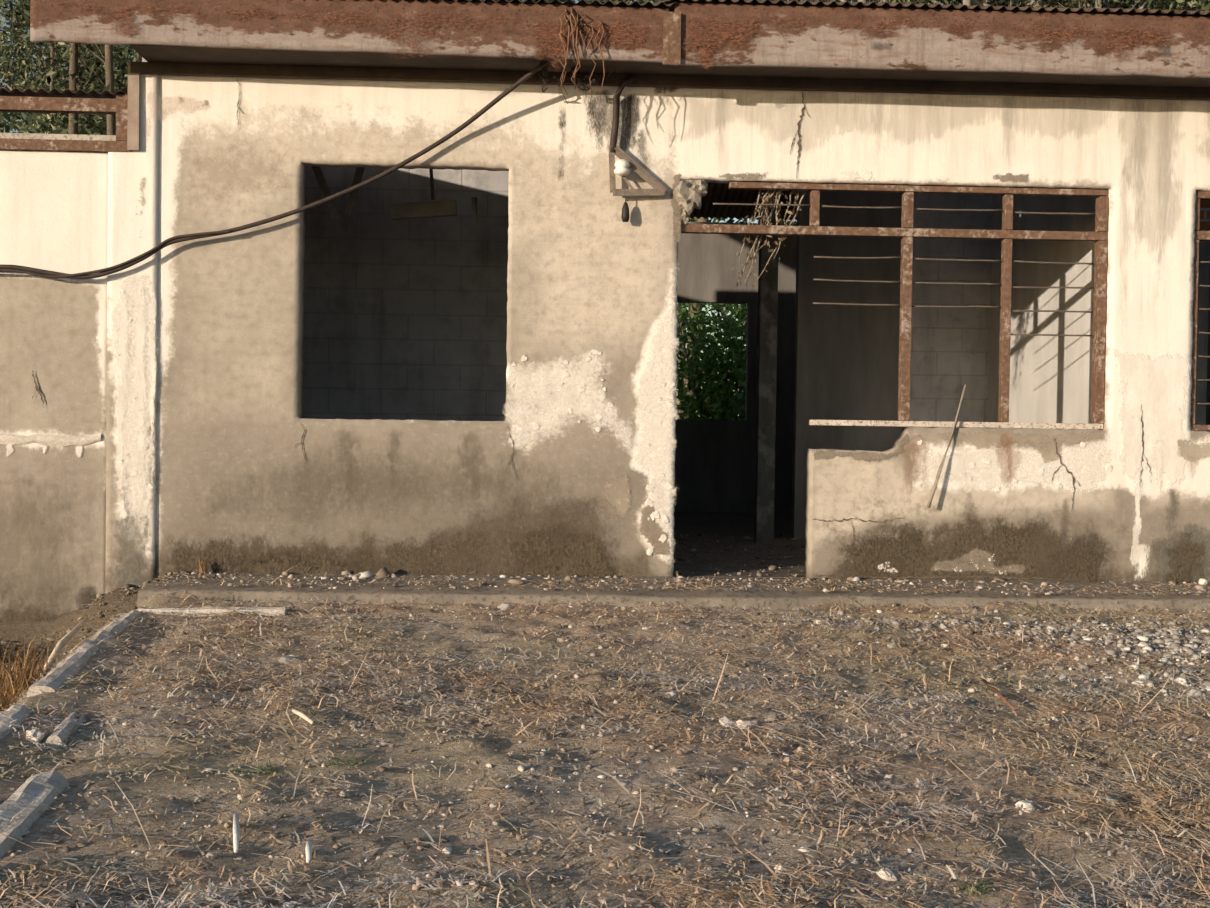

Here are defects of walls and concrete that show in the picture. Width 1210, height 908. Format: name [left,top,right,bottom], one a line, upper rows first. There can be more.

corrosion [532,20,648,67]
damp [622,96,646,165]
crack [790,92,810,178]
spalling [670,172,766,242]
spalling [843,171,875,181]
spalling [993,173,1029,183]
crack [32,371,44,407]
peeling [505,296,678,560]
damp [171,531,490,575]
crack [1052,439,1080,513]
damp [1130,468,1150,578]
damp [1169,491,1178,518]